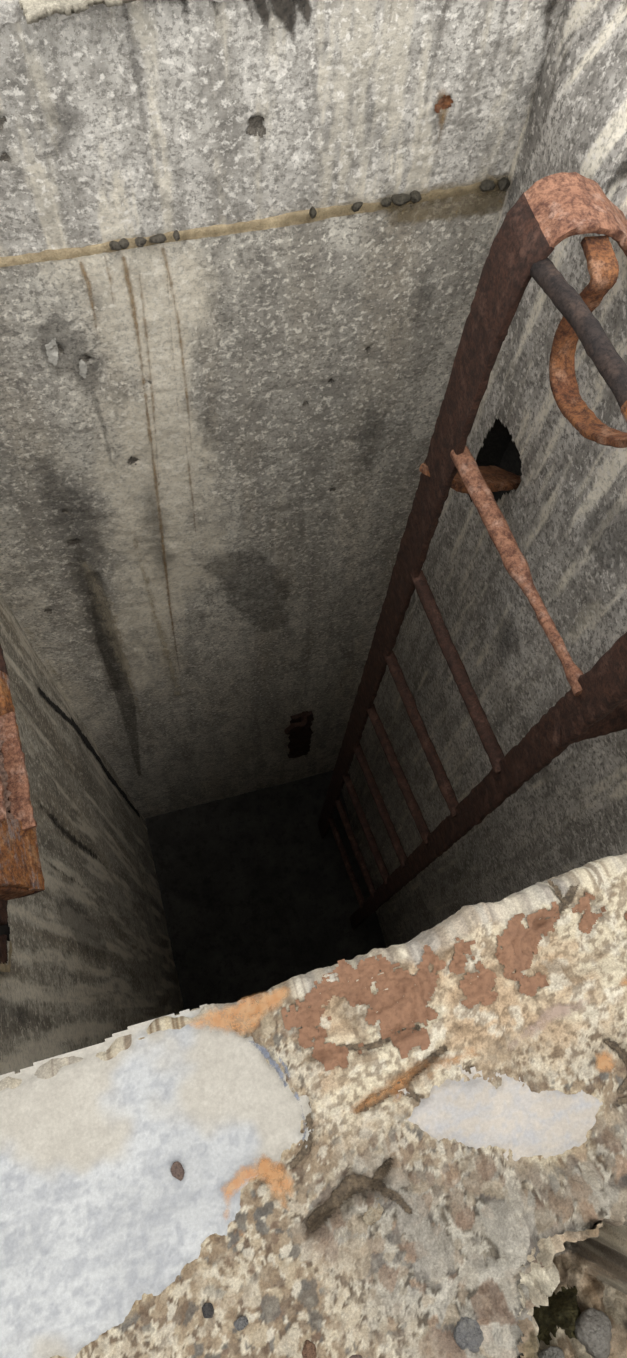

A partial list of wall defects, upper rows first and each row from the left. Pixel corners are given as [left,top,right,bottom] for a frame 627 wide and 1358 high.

water stain [244,0,311,42]
hole [476,418,522,502]
peeling [281,892,606,1071]
crack [310,1025,448,1114]
crack [289,1099,313,1168]
crack [306,1159,412,1231]
spalling [517,1216,627,1358]